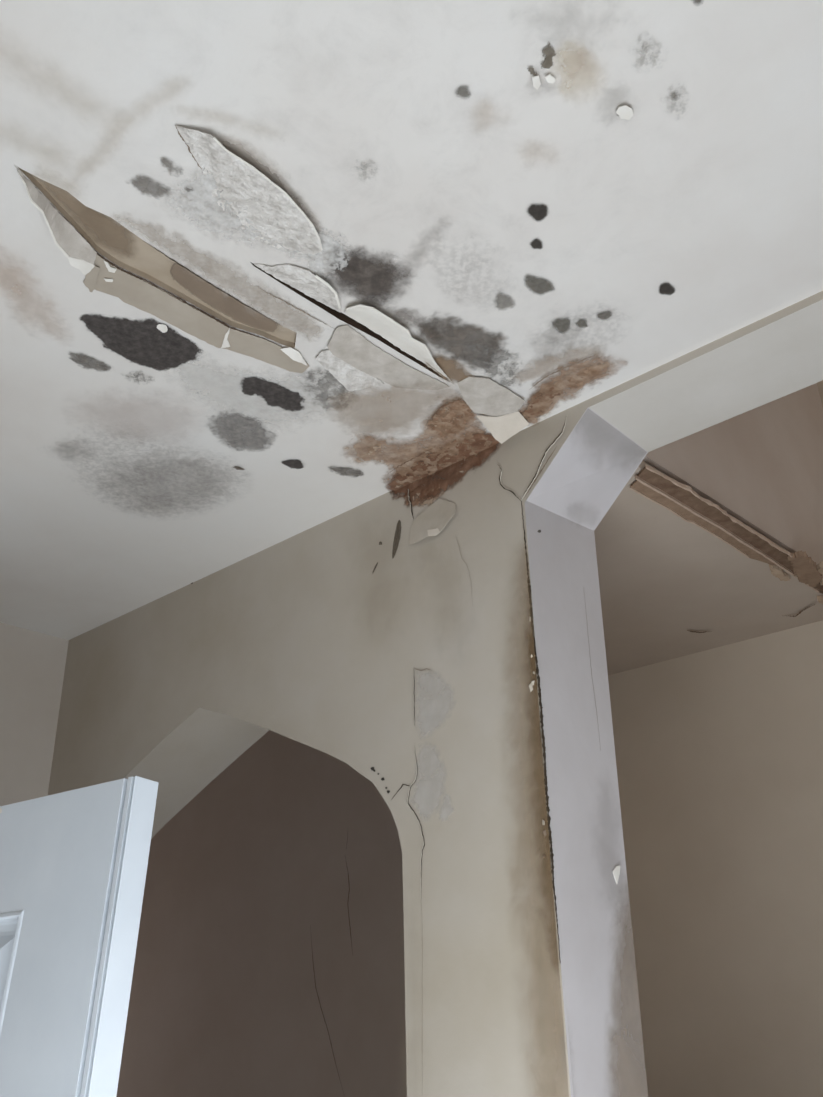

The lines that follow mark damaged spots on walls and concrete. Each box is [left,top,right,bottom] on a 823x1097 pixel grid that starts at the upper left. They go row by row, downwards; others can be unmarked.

mould [528,205,548,221]
flaking render [15,125,529,444]
water stain [296,233,408,303]
mould [525,276,554,294]
water stain [659,284,675,295]
water stain [70,353,111,371]
water stain [80,315,348,450]
water stain [395,310,515,386]
water stain [282,460,303,469]
flaking render [630,464,823,605]
crack [497,416,567,963]
crack [370,668,432,1090]